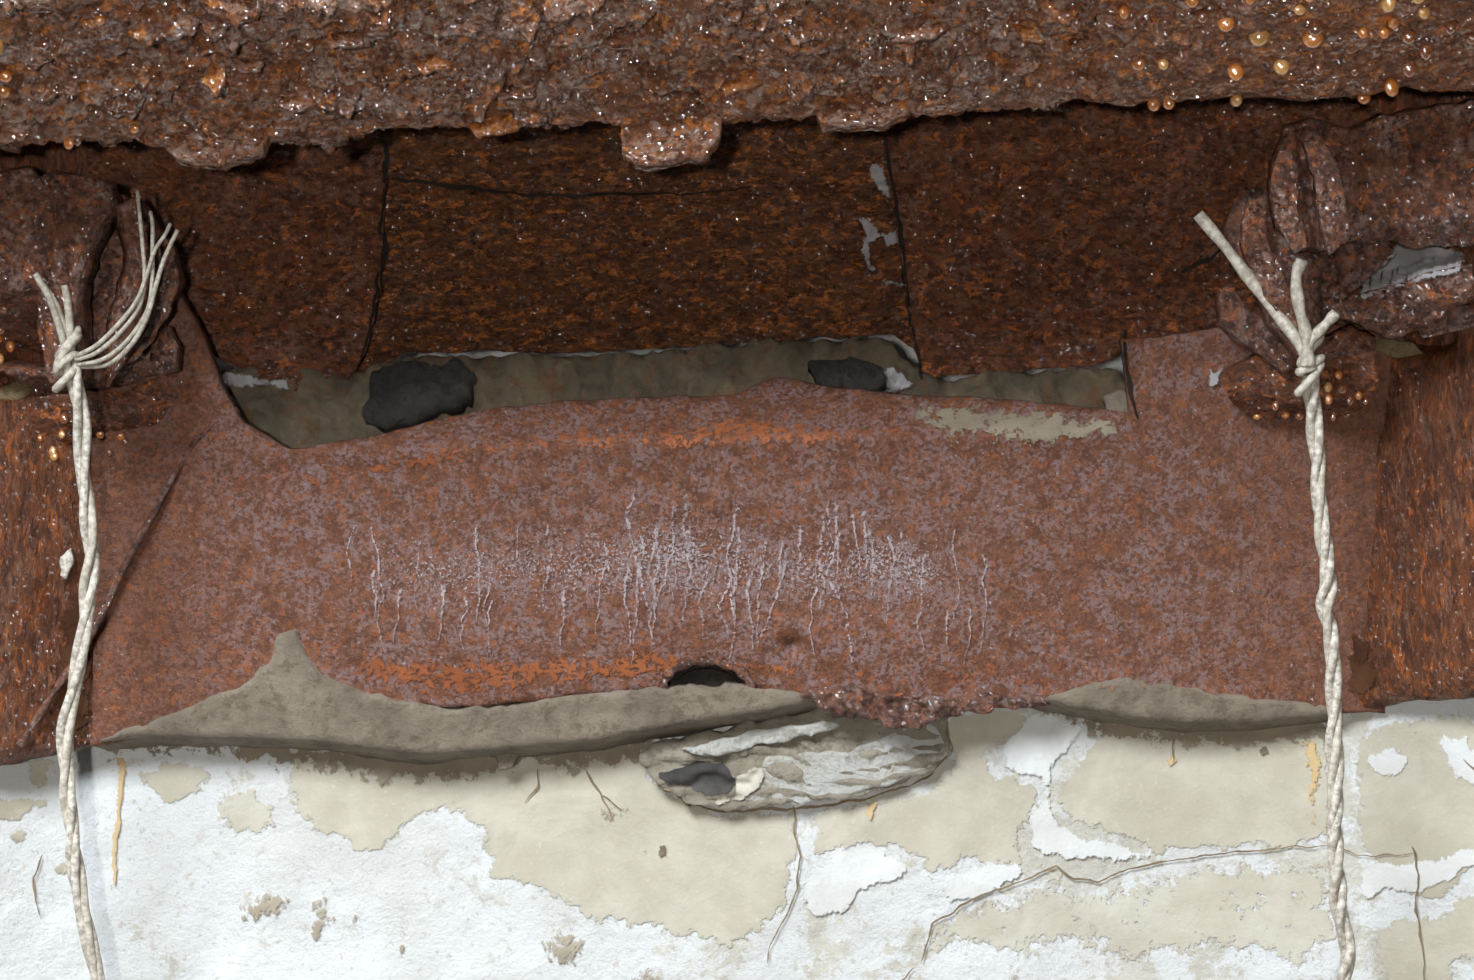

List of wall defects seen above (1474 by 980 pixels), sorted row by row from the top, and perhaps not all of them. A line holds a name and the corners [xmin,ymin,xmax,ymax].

rust [155,130,270,171]
rust [466,83,539,139]
rust [621,111,722,171]
rust [816,98,913,135]
crack [884,138,923,380]
spalling [361,358,477,433]
spalling [807,357,886,392]
water stain [345,473,1003,665]
peeling [138,682,1050,948]
peeling [923,723,1337,967]
crack [902,845,1425,980]
peeling [1355,713,1474,980]